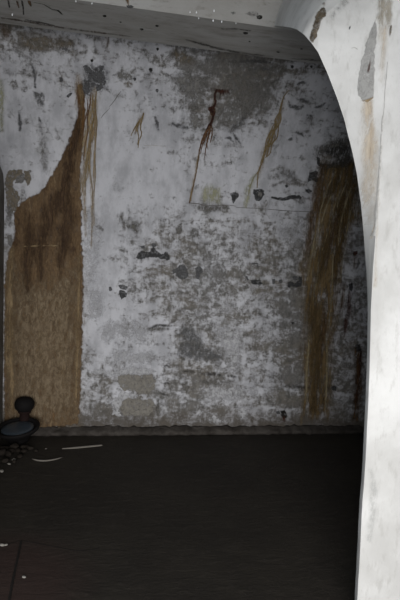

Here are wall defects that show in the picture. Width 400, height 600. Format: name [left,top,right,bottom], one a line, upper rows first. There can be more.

spalling [310,2,326,43]
spalling [83,59,108,95]
spalling [358,22,377,102]
rust [189,89,230,203]
water stain [317,137,355,173]
spalling [136,243,170,260]